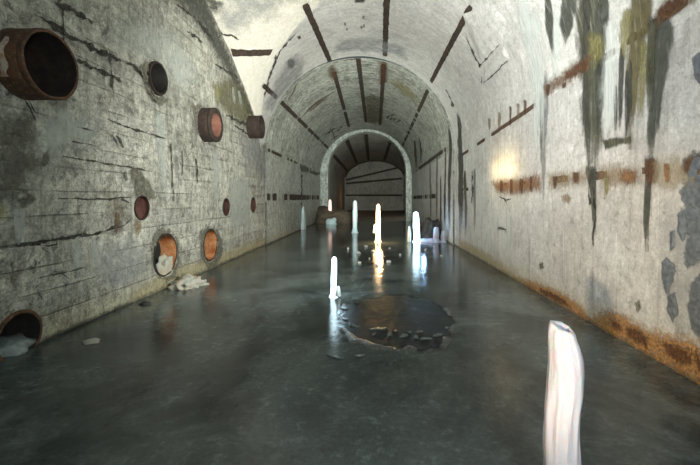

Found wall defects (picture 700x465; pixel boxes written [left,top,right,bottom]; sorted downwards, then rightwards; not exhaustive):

crack [39,0,157,102]
corrosion [544,57,590,95]
corrosion [477,100,536,146]
water stain [519,0,672,243]
corrosion [493,176,540,194]
crack [3,220,130,248]
peeling [661,150,700,322]
corrosion [459,242,700,384]
peeling [687,275,700,337]